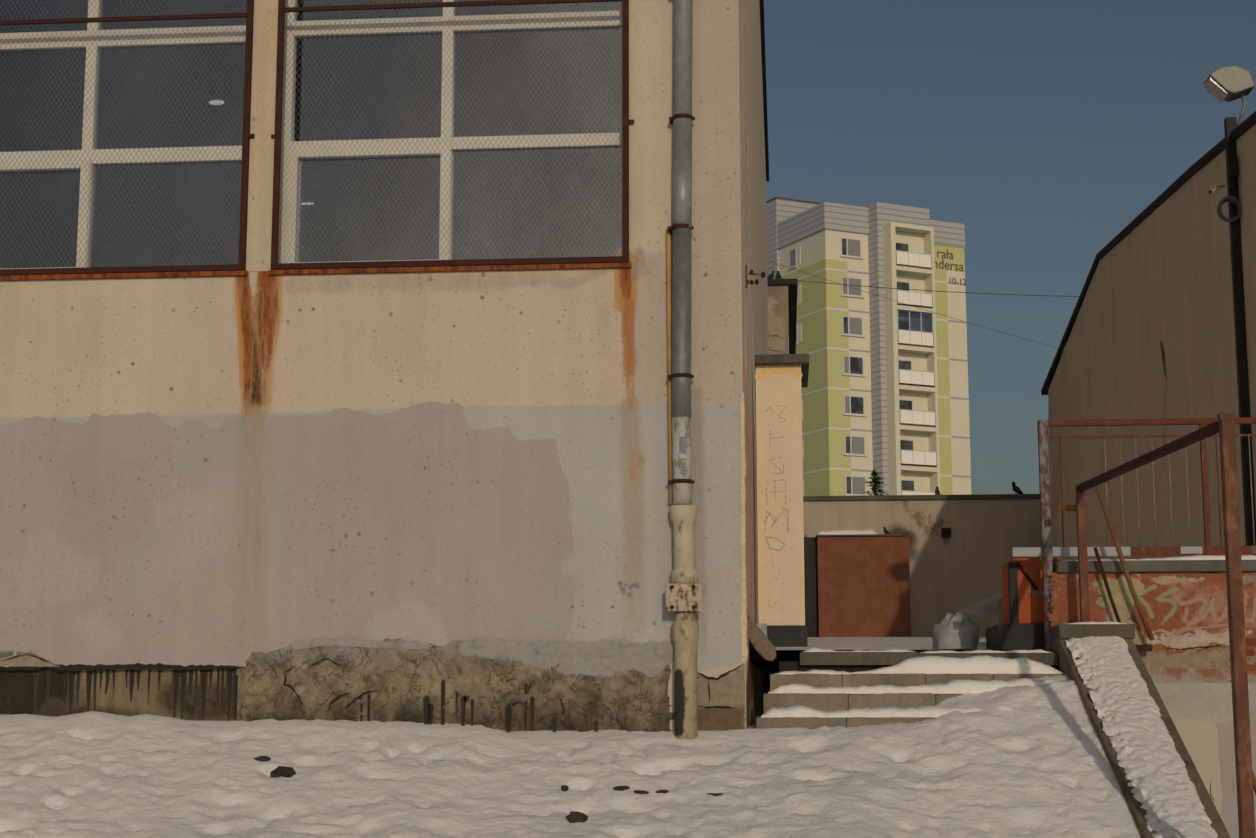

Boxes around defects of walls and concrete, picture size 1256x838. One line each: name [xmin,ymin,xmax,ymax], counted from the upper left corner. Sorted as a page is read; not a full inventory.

rust [234,271,282,422]
rust [614,252,638,410]
flaking render [1047,572,1231,683]
flaking render [1242,572,1256,681]
damp [0,668,238,721]